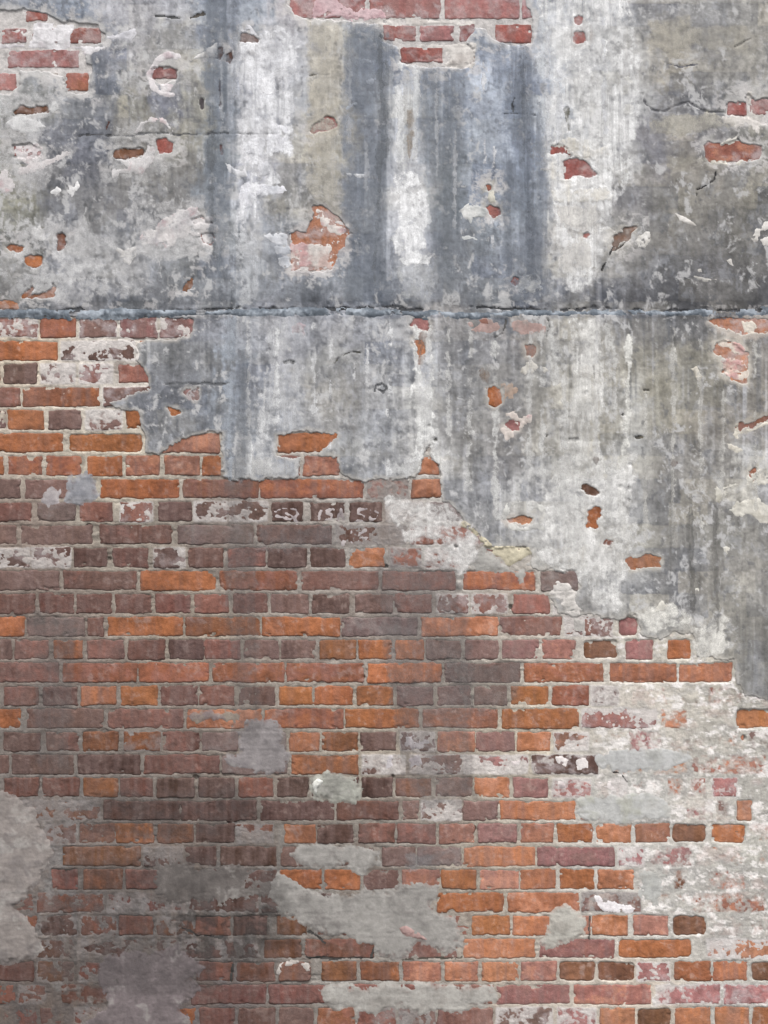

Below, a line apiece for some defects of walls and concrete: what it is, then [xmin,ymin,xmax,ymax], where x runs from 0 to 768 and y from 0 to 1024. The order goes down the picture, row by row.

spalling [0,9,136,95]
spalling [287,0,533,69]
crack [643,98,721,113]
spalling [704,91,768,166]
water stain [124,0,458,359]
water stain [225,322,342,480]
water stain [352,346,369,392]
spalling [69,434,143,452]
spalling [581,484,602,529]
peeling [549,581,638,659]
spalling [672,824,745,843]
spalling [559,915,706,981]